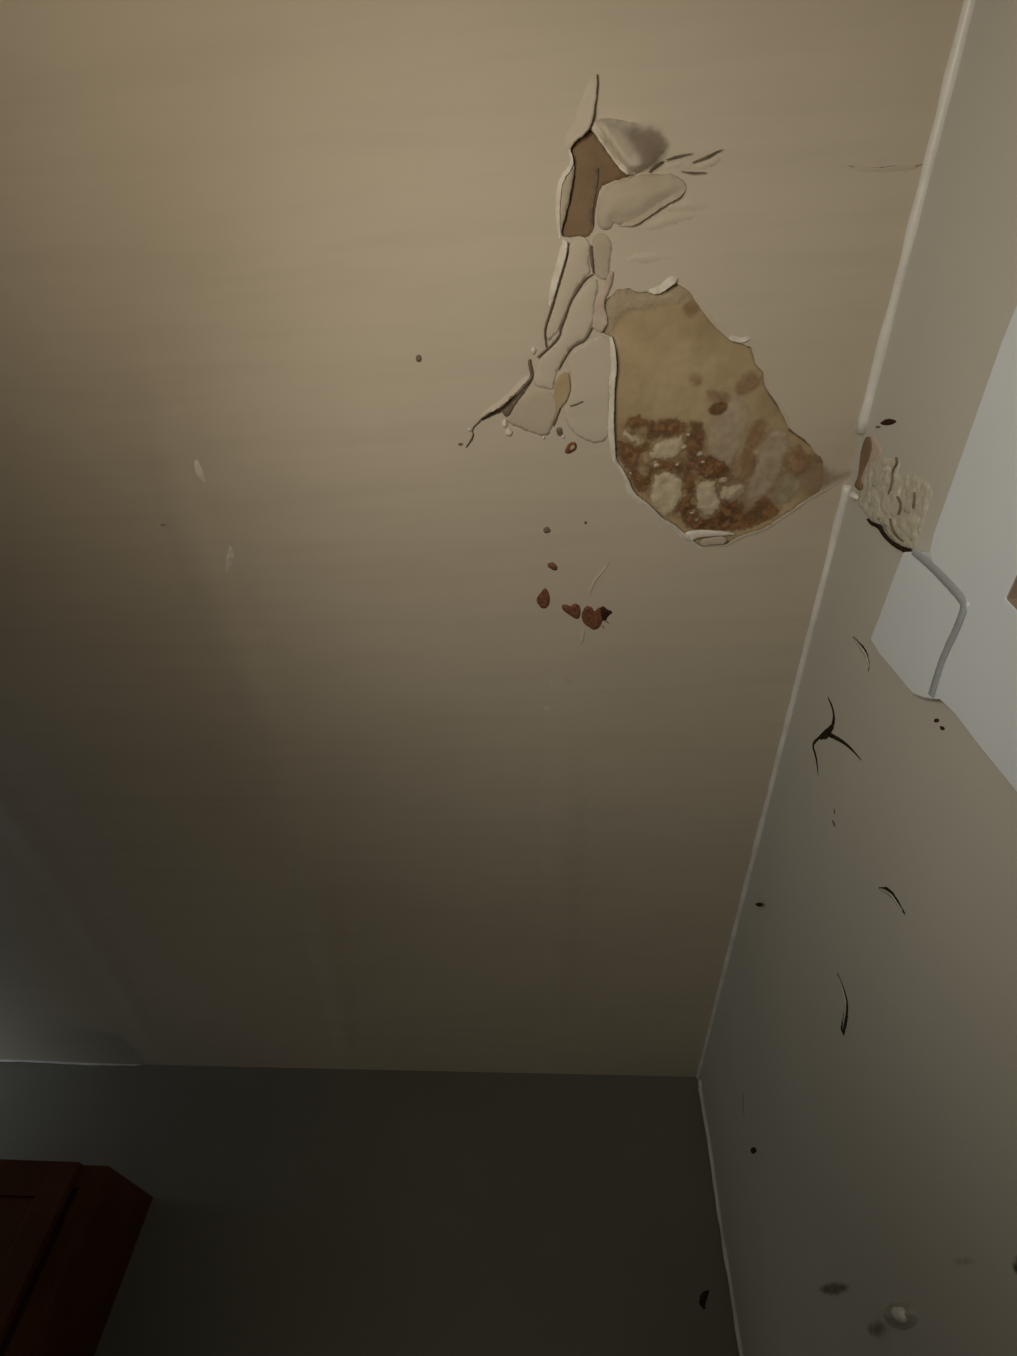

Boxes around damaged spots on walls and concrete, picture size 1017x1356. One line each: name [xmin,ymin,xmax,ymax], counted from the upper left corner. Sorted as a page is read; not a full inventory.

spalling [502,75,932,553]
rust [537,588,612,630]
crack [853,637,869,671]
crack [812,697,861,772]
crack [837,973,849,1036]